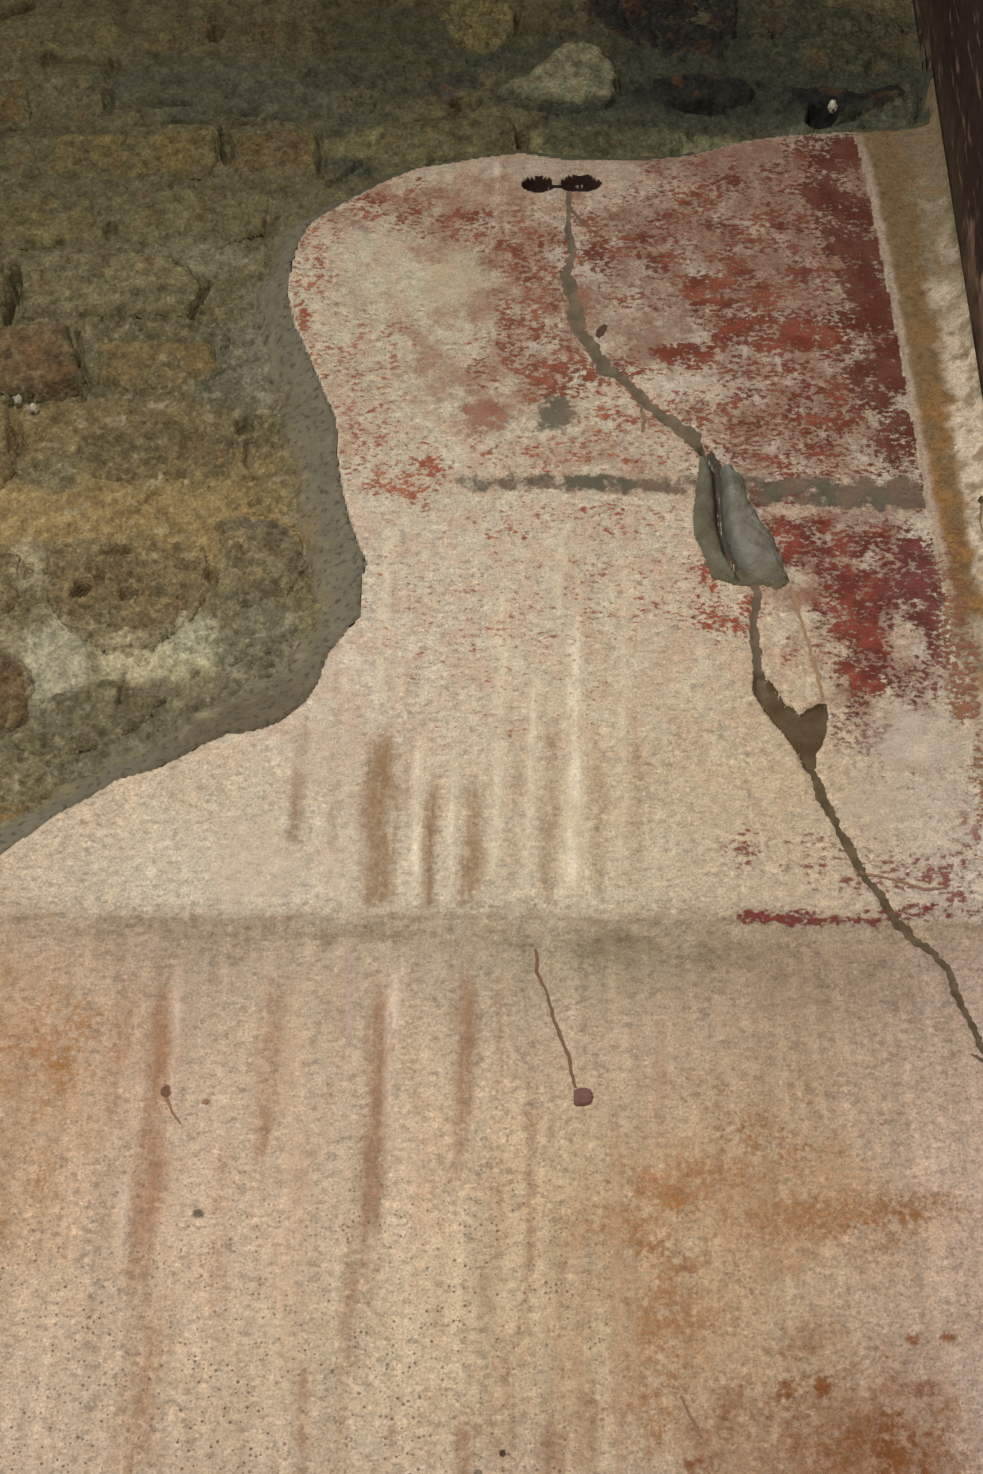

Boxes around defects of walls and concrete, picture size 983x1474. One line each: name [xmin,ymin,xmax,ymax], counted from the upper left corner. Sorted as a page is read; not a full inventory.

crack [559,191,706,458]
flaking render [0,0,983,929]
crack [749,584,824,700]
damp [557,563,582,889]
damp [324,740,393,896]
damp [410,748,503,903]
crack [801,762,983,1062]
crack [534,949,577,1088]
damp [363,974,399,1228]
corrosion [784,1194,938,1239]
corrosion [815,1377,830,1394]
corrosion [818,1412,930,1474]